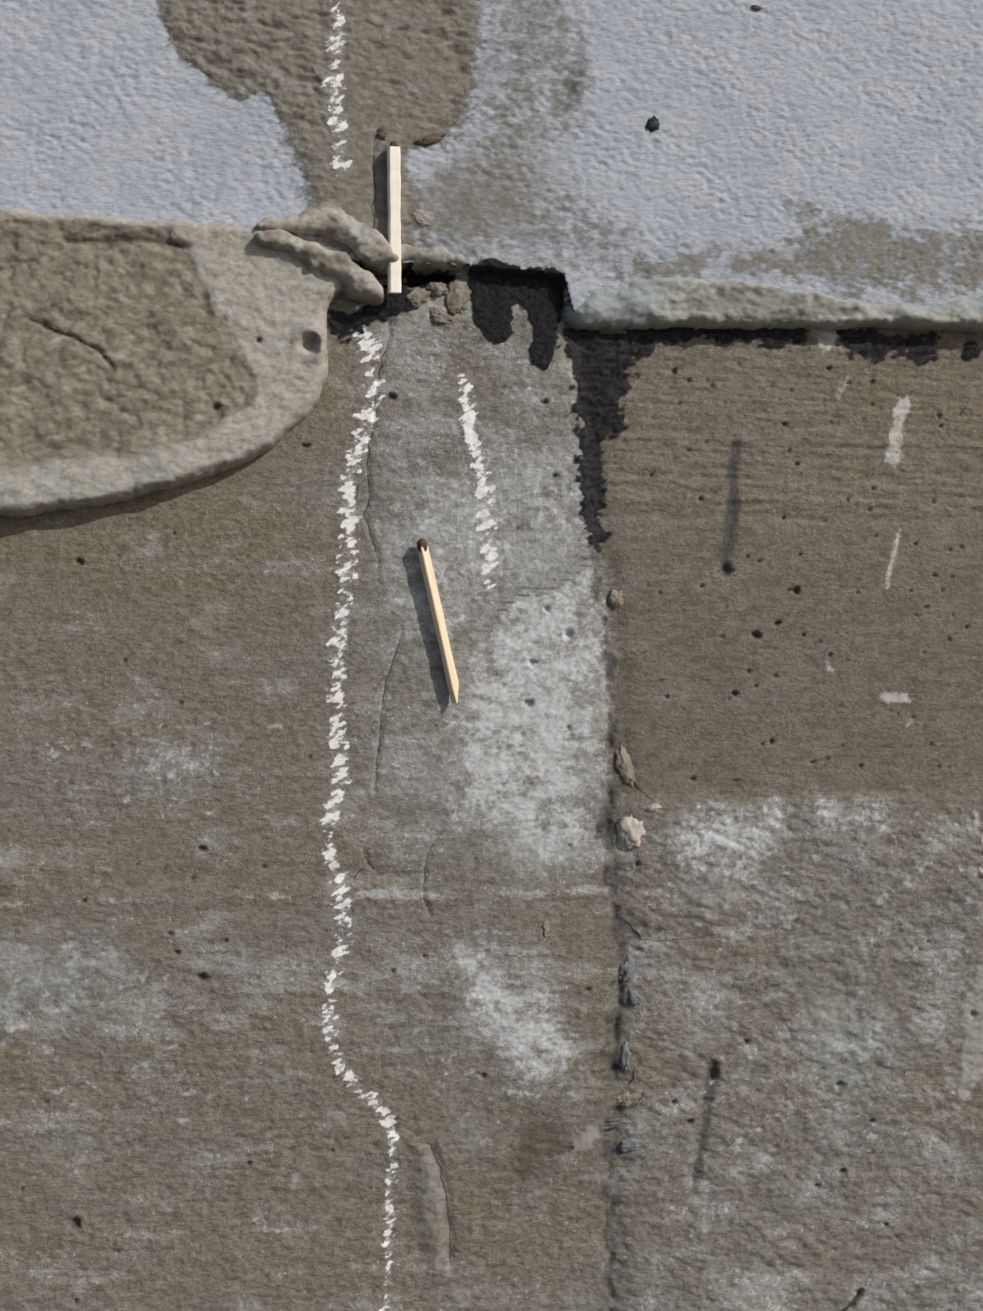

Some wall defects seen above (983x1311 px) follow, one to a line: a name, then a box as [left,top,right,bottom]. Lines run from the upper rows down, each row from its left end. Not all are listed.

peeling [157,0,486,246]
peeling [316,235,358,260]
damp [722,441,740,570]
damp [377,455,620,879]
damp [664,797,897,898]
damp [441,937,591,1090]
damp [694,1060,719,1182]
damp [817,998,947,1127]